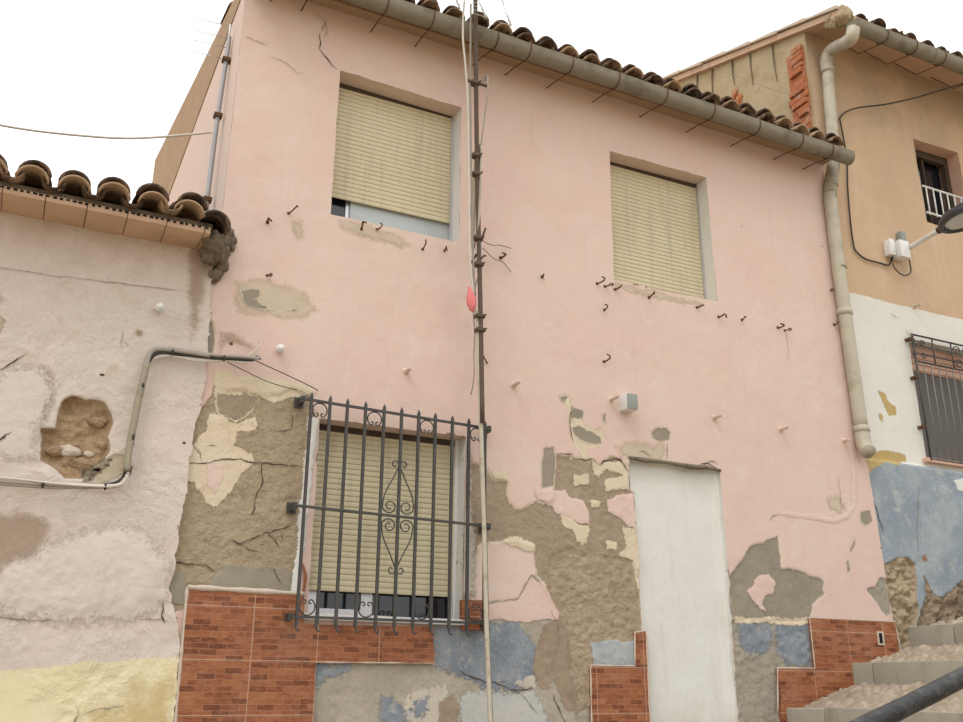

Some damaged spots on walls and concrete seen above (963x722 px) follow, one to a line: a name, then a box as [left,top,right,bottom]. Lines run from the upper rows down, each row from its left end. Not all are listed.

crack [0,267,174,290]
flaking render [240,288,273,311]
flaking render [40,396,124,484]
peeling [878,390,897,421]
flaking render [169,369,315,612]
crack [190,445,301,583]
peeling [313,395,721,722]
flaking render [729,535,825,722]
flaking render [867,557,963,650]